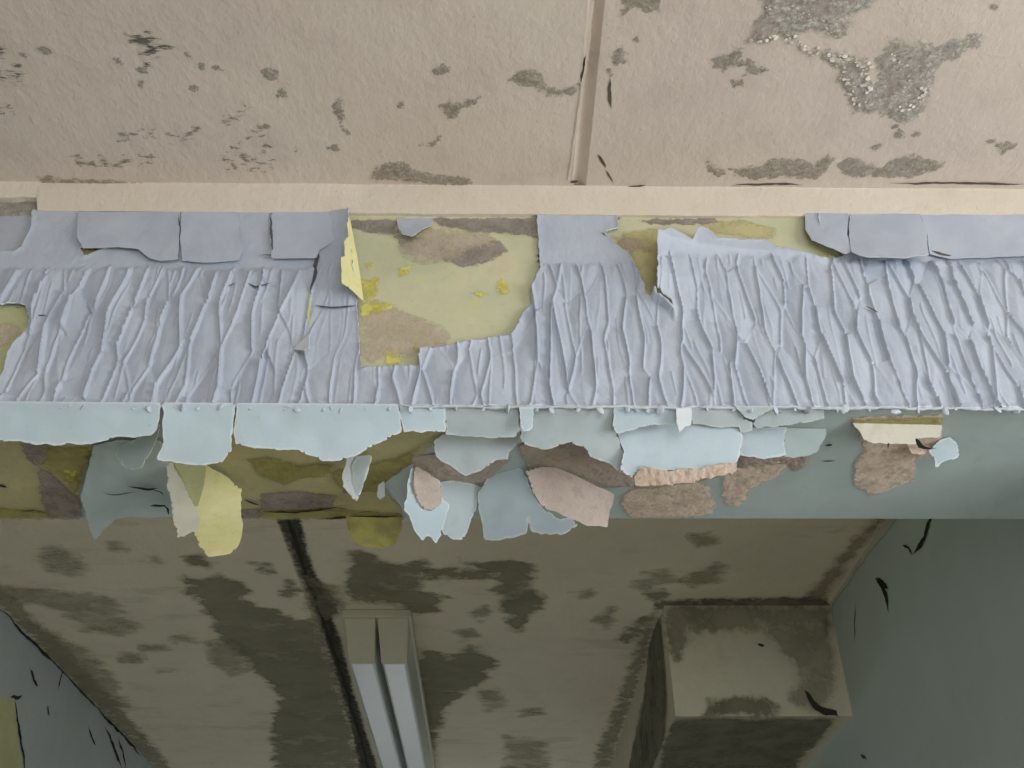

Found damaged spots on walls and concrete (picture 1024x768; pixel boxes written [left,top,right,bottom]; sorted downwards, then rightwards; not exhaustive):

damp [126,31,174,67]
peeling [77,212,243,263]
peeling [270,212,540,368]
peeling [607,213,1024,295]
peeling [0,401,827,557]
damp [619,519,881,643]
crack [875,578,889,613]
flaking render [852,414,959,496]
crack [902,519,931,554]
damp [0,590,168,768]
damp [183,551,547,768]
damp [639,647,655,763]